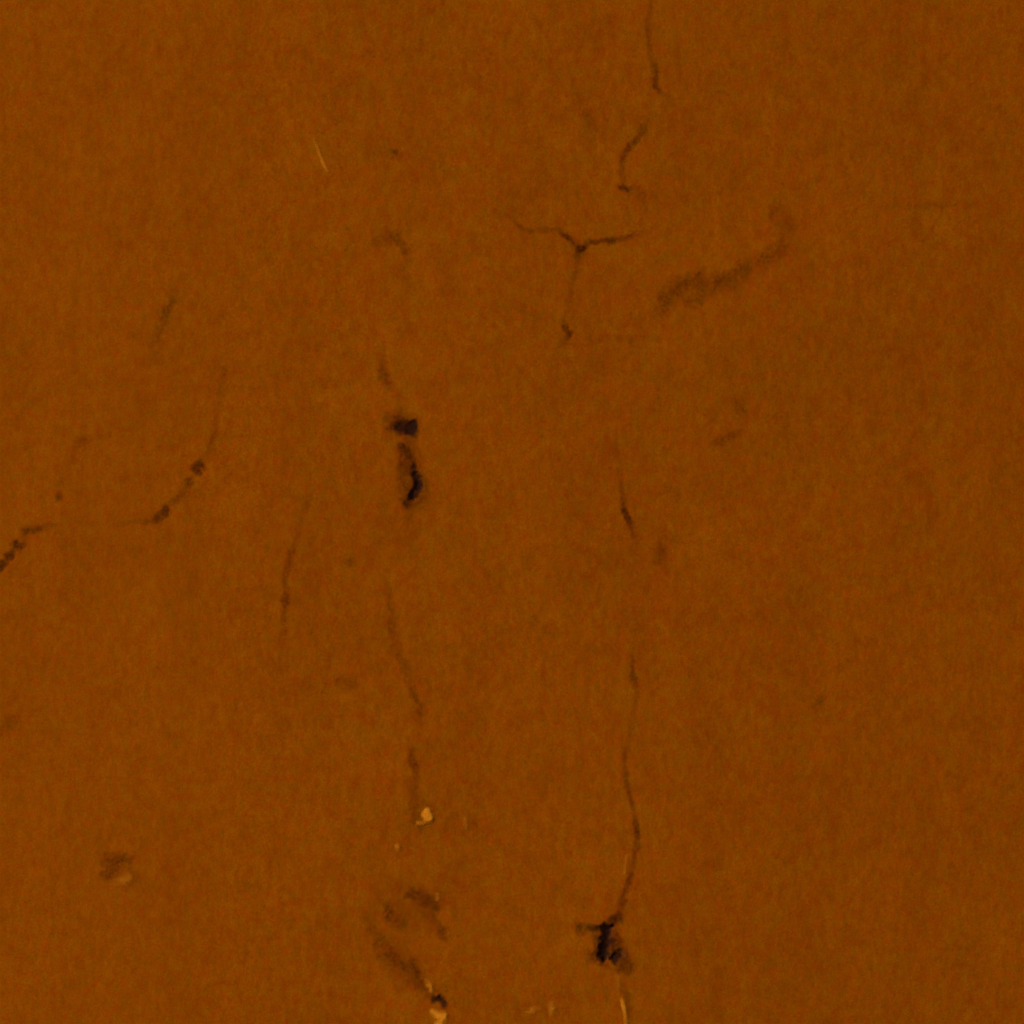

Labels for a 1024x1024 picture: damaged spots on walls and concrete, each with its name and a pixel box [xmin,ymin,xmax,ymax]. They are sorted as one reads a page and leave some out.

crack [0,530,28,571]